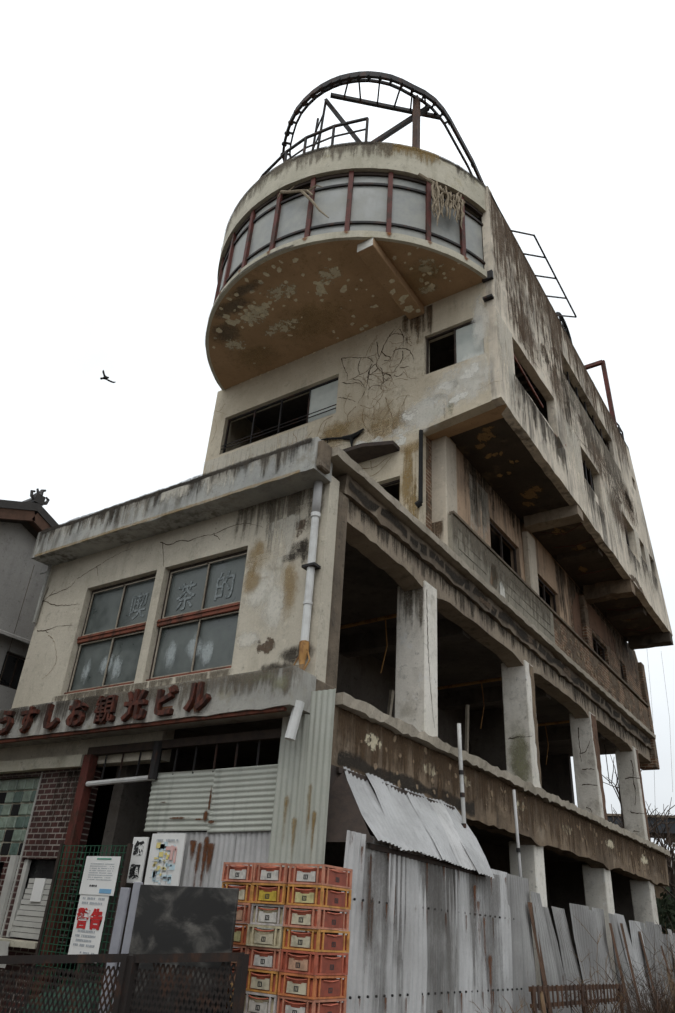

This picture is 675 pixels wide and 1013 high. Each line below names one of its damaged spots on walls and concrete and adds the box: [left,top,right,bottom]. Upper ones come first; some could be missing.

peeling [212,251,378,350]
peeling [389,247,460,313]
crack [289,328,418,476]
leakage [208,141,657,589]
leakage [39,426,312,542]
spalling [257,637,275,654]
leakage [236,484,324,626]
leakage [349,455,651,752]
rust [169,788,214,824]
rust [190,836,215,887]
rust [284,786,316,848]
leakage [337,707,667,883]